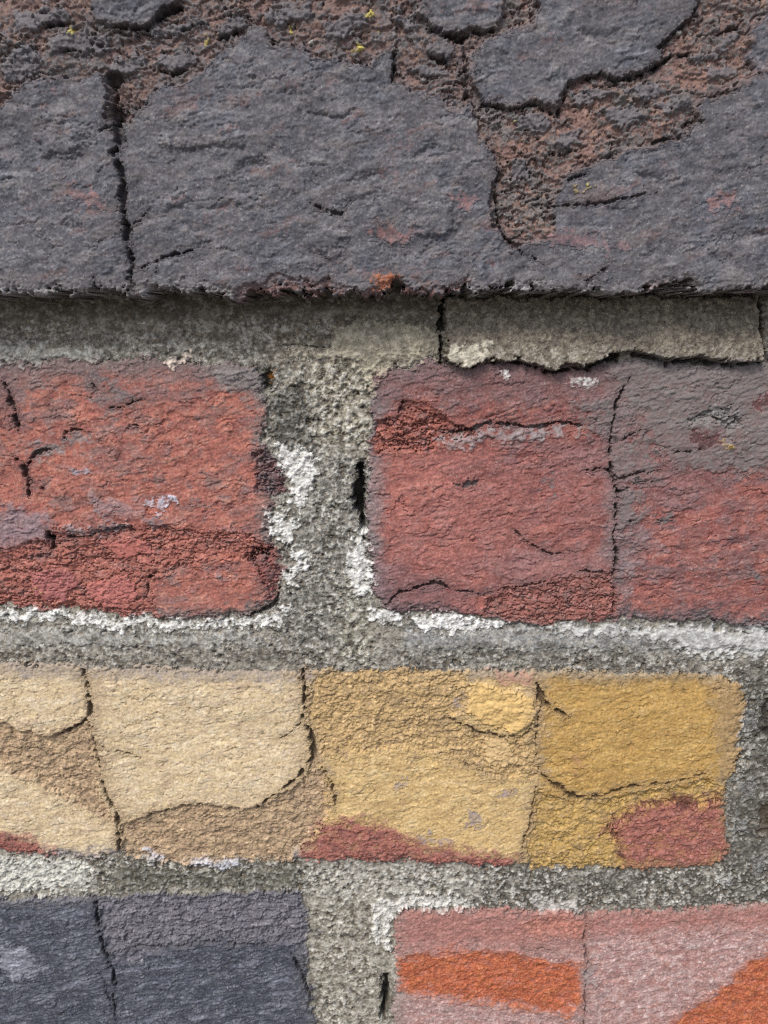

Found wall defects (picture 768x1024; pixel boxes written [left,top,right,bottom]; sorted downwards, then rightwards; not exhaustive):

crack [42,0,277,295]
spalling [0,0,768,250]
crack [0,378,145,499]
damp [0,282,494,589]
spalling [365,394,482,463]
crack [383,287,768,618]
crack [19,667,338,852]
crack [439,681,707,861]